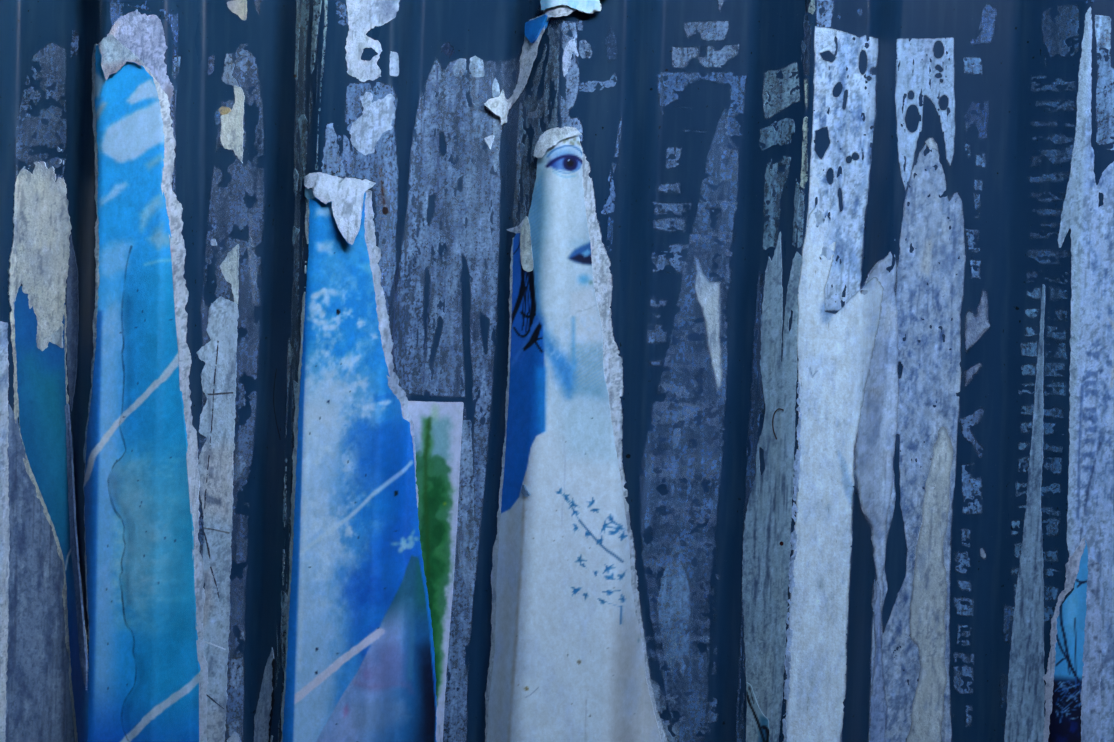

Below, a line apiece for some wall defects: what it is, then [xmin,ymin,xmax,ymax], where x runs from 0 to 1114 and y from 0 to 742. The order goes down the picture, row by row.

peeling [321,92,399,296]